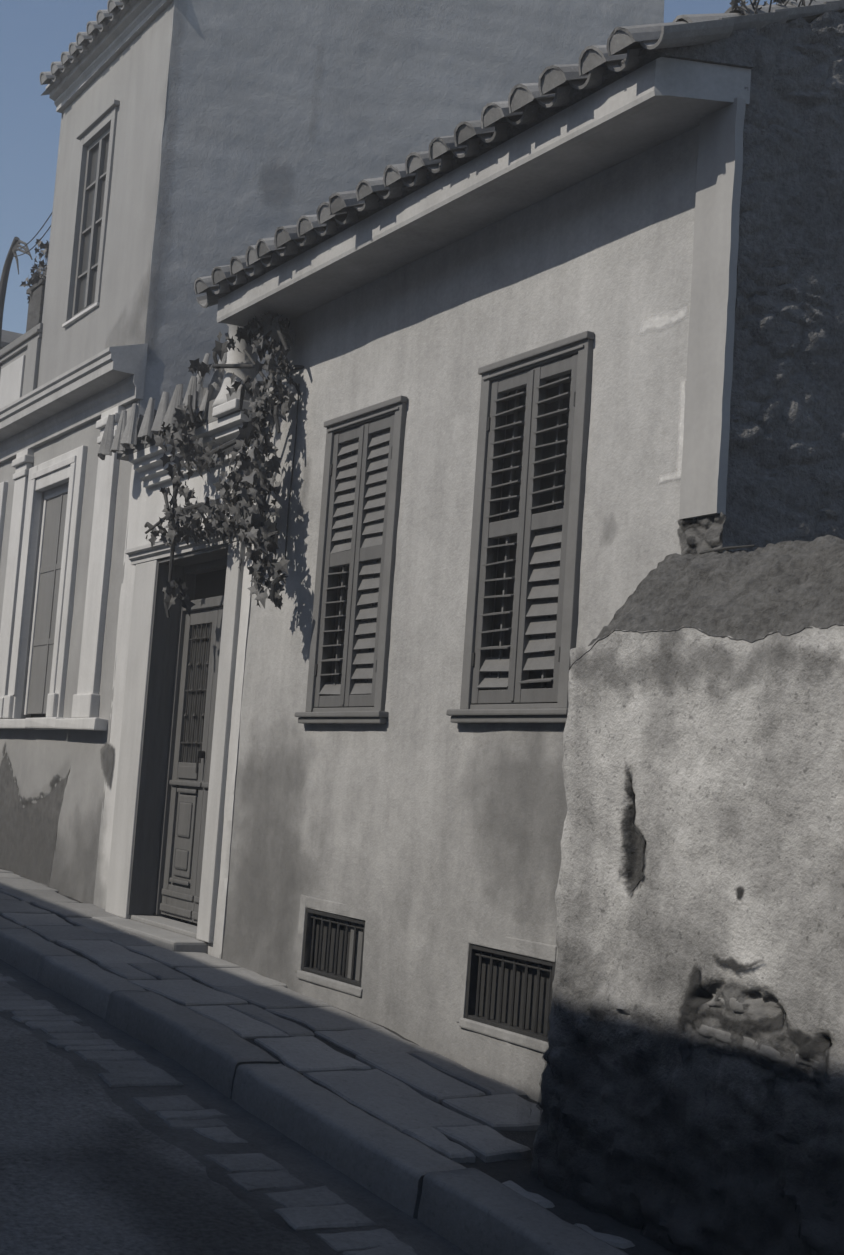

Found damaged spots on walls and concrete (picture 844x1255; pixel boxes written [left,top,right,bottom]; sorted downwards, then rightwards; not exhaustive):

flaking render [0,744,70,886]
flaking render [621,769,646,895]
flaking render [678,954,832,1096]